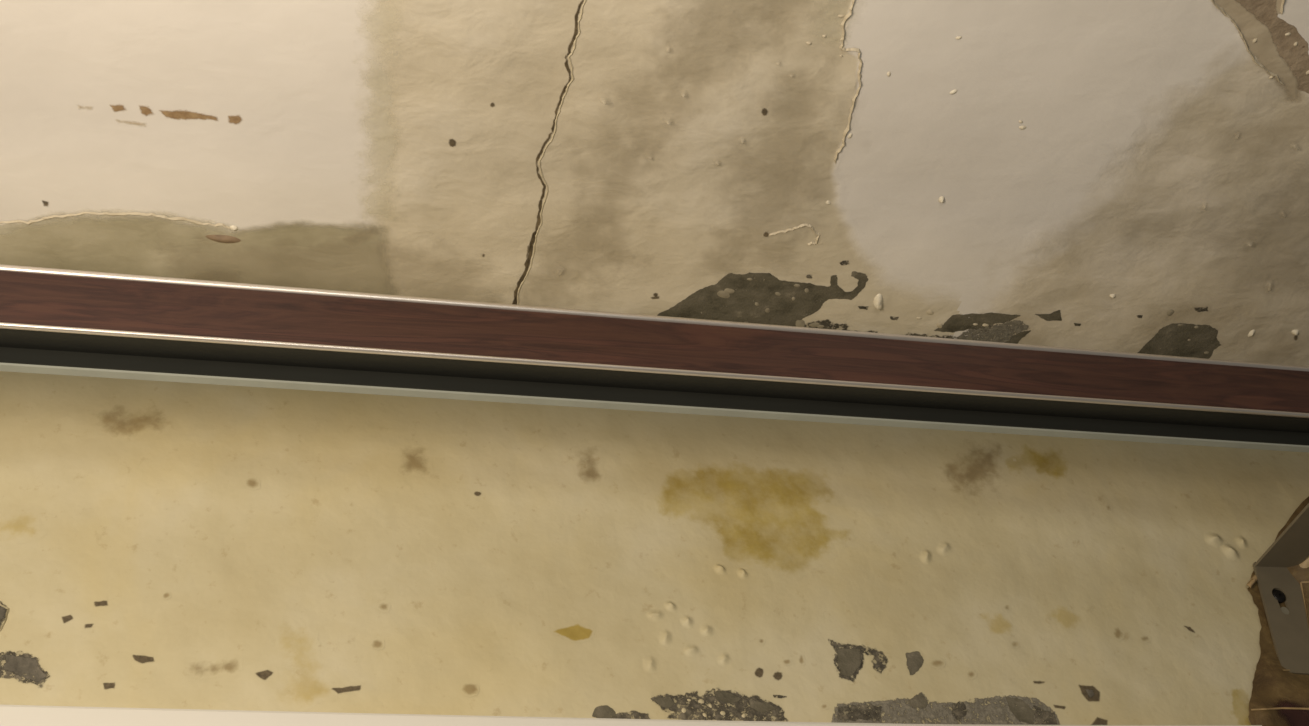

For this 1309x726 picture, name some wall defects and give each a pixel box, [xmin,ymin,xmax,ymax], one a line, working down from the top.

peeling [1211,0,1309,100]
rust [111,105,241,124]
crack [512,0,587,305]
leakage [0,0,1309,367]
spalling [652,261,898,331]
spalling [906,310,1081,344]
spalling [1138,307,1221,359]
leakage [649,457,859,582]
spalling [0,651,50,687]
spalling [592,668,787,721]
spalling [830,640,888,682]
spalling [832,692,1059,725]